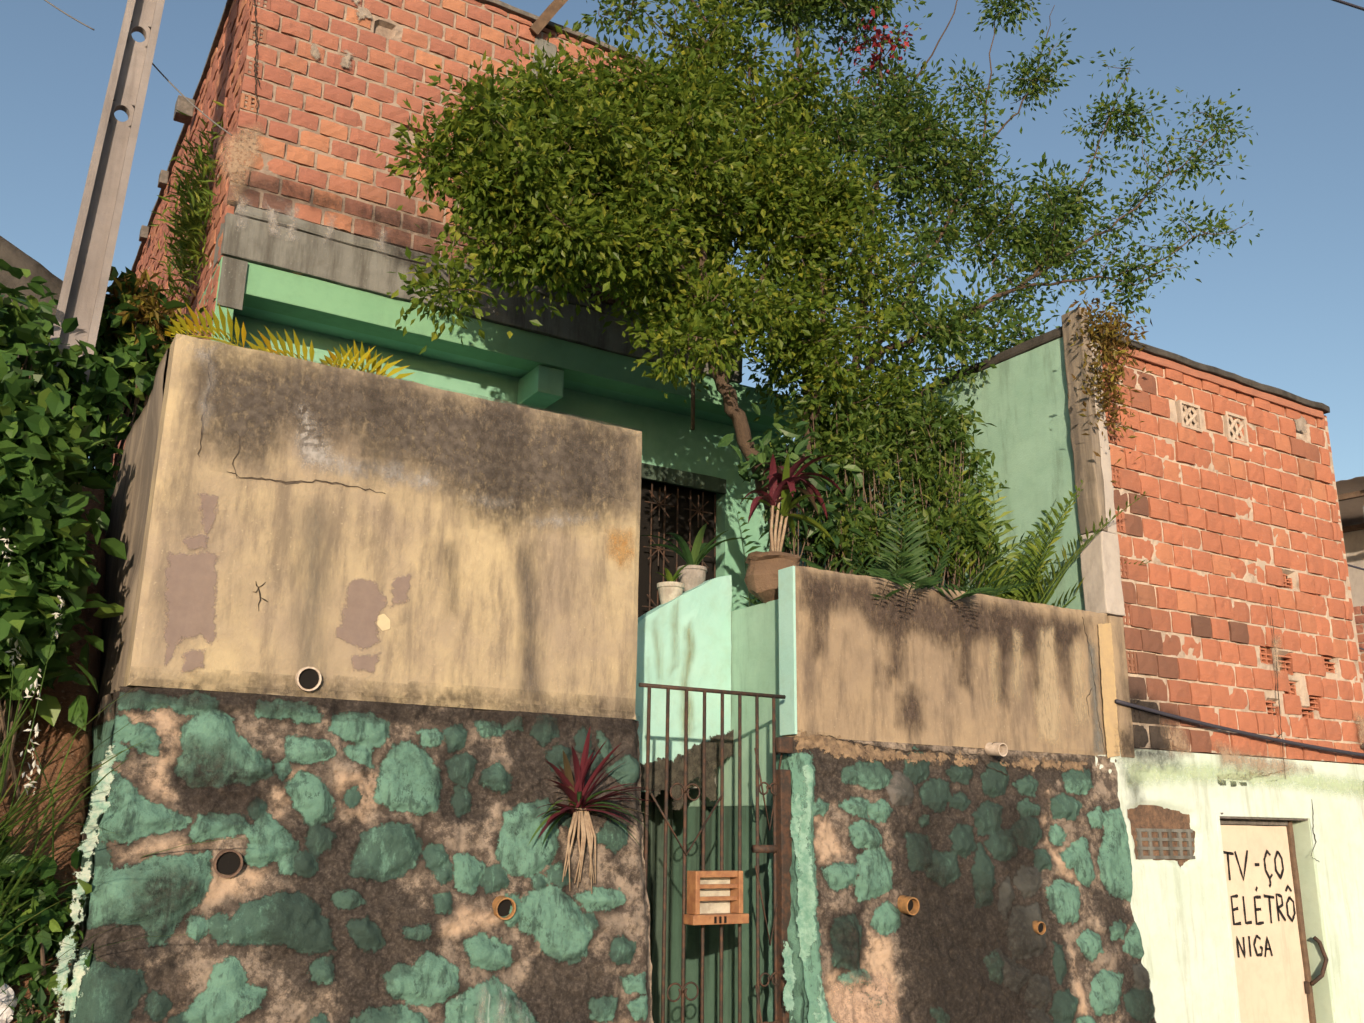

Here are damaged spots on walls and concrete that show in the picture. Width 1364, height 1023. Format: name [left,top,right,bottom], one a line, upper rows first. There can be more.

crack [198,348,212,457]
crack [230,446,385,494]
leakage [199,354,630,516]
peeling [164,494,218,672]
peeling [336,574,411,672]
leakage [804,574,1102,753]
spalling [1127,805,1195,867]